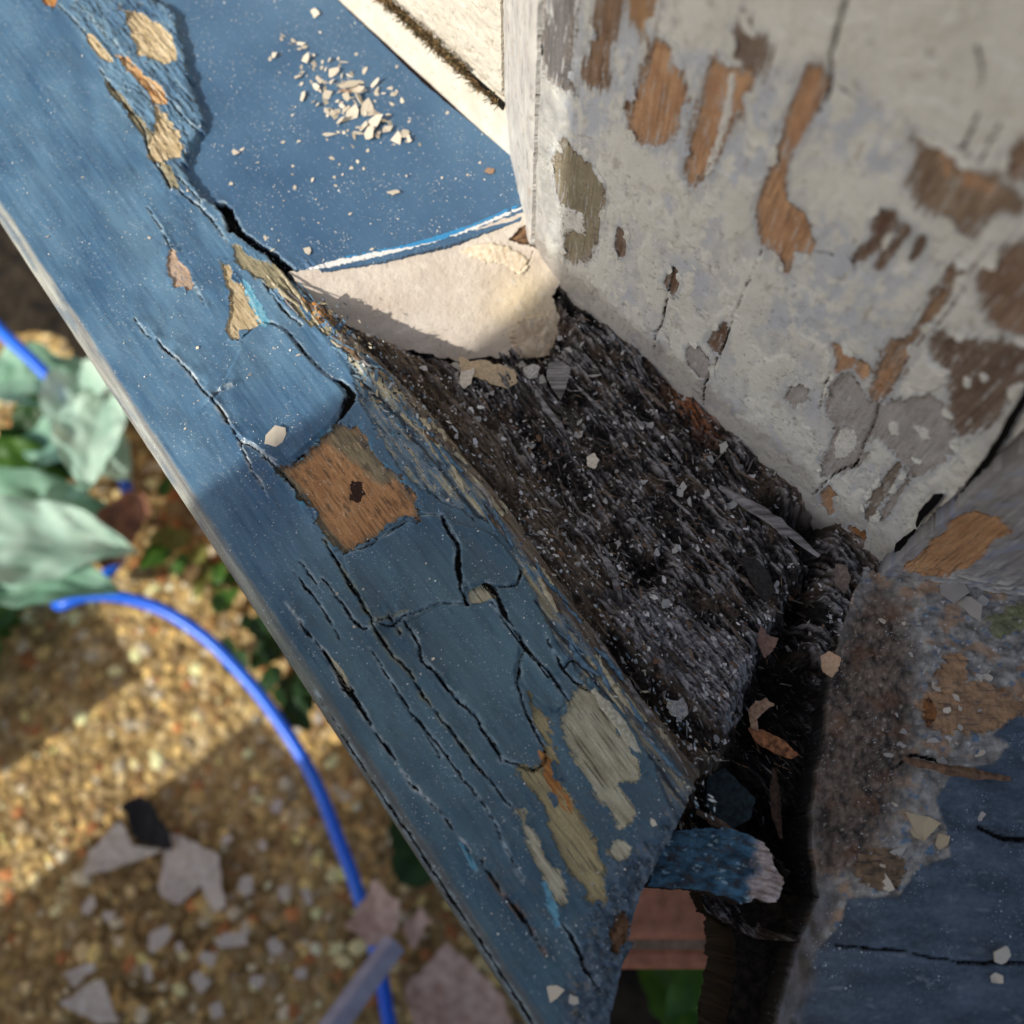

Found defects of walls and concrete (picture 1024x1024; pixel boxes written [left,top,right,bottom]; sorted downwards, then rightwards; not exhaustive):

peeling [86,3,194,190]
peeling [218,243,346,346]
peeling [549,138,606,263]
peeling [540,0,774,189]
peeling [755,63,830,274]
peeling [785,131,1024,551]
peeling [275,418,426,553]
crack [301,515,589,818]
peeling [813,651,841,682]
crack [344,738,537,1024]
crack [562,925,590,977]
peeling [513,678,650,917]